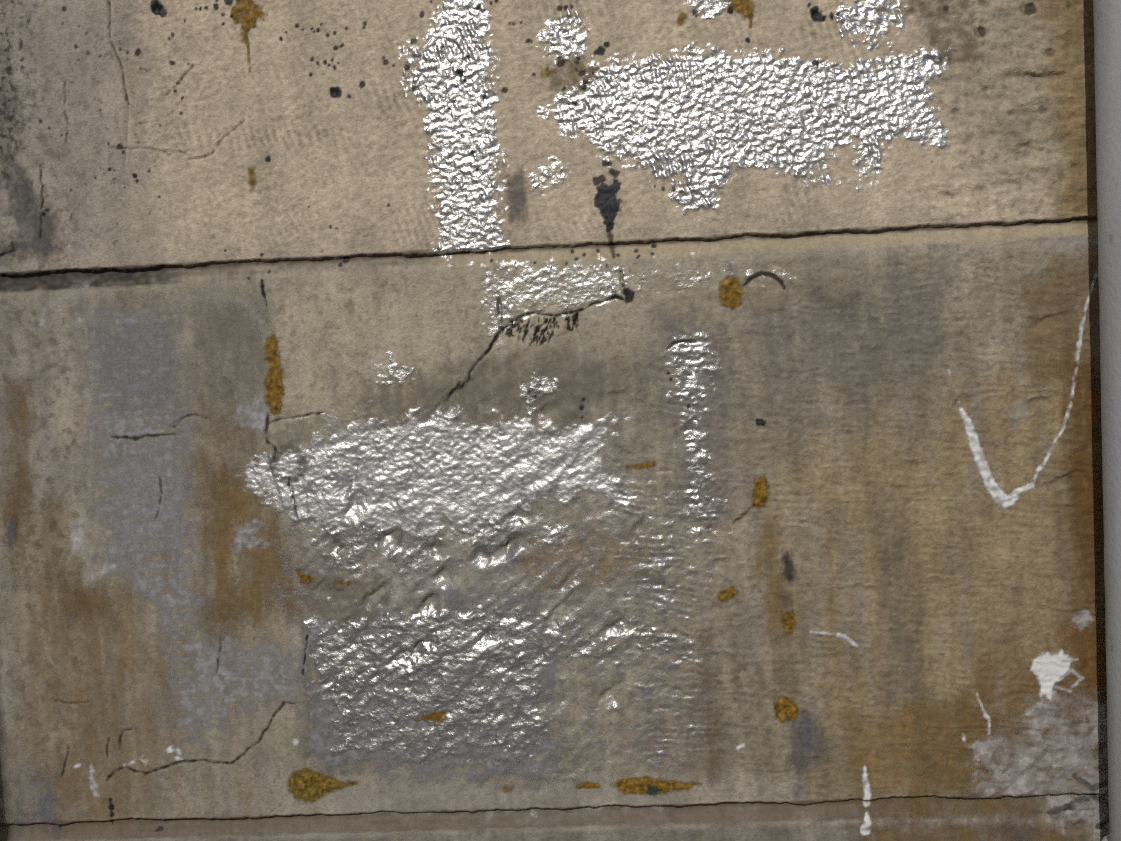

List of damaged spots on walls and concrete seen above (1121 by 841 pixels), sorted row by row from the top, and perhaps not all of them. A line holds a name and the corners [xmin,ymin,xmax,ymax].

leakage [6,164,54,257]
crack [450,284,624,395]
leakage [1059,659,1084,692]
crack [106,702,285,778]